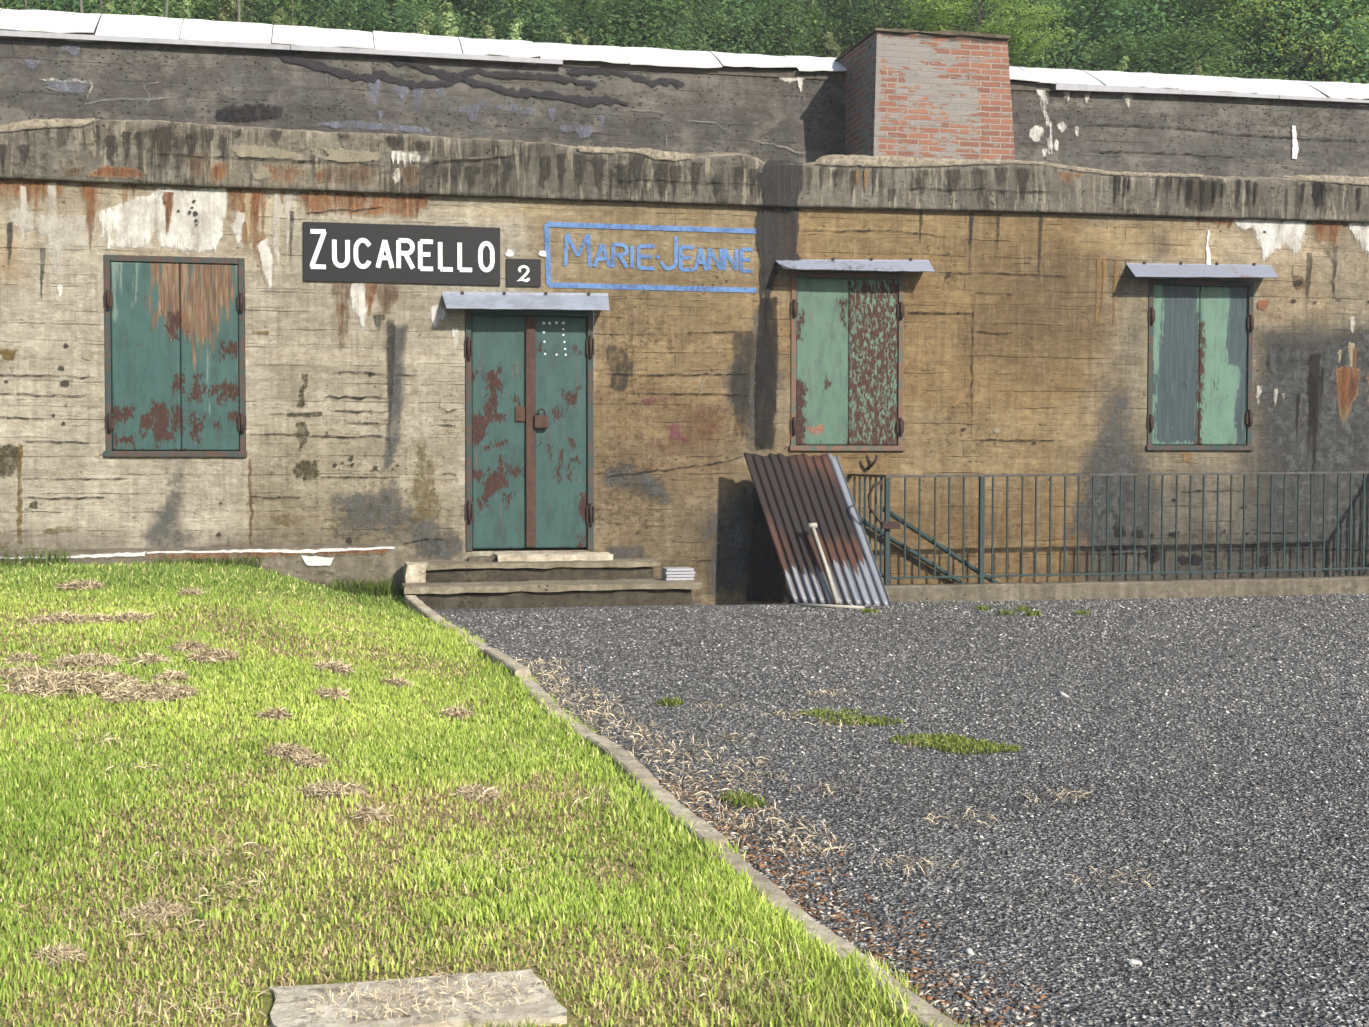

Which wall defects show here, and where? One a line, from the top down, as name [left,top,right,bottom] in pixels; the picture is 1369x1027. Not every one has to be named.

leakage [0,144,30,167]
rust [0,166,141,298]
leakage [1302,181,1331,211]
leakage [726,297,783,450]
leakage [1257,317,1369,553]
rust [1336,343,1369,420]